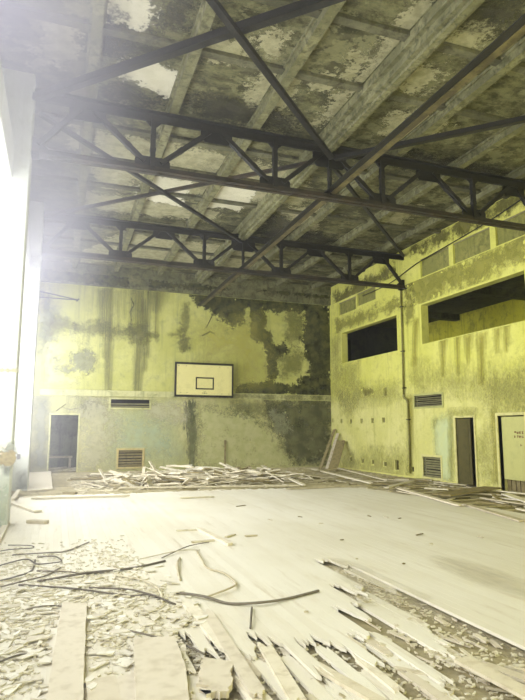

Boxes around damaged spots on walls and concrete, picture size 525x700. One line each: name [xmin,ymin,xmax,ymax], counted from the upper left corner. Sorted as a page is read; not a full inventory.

peeling [106,0,161,32]
leakage [457,0,525,36]
peeling [207,24,295,62]
peeling [118,63,178,99]
leakage [187,91,258,127]
leakage [260,107,302,136]
leakage [37,270,225,391]
leakage [233,267,396,466]
leakage [184,400,199,468]